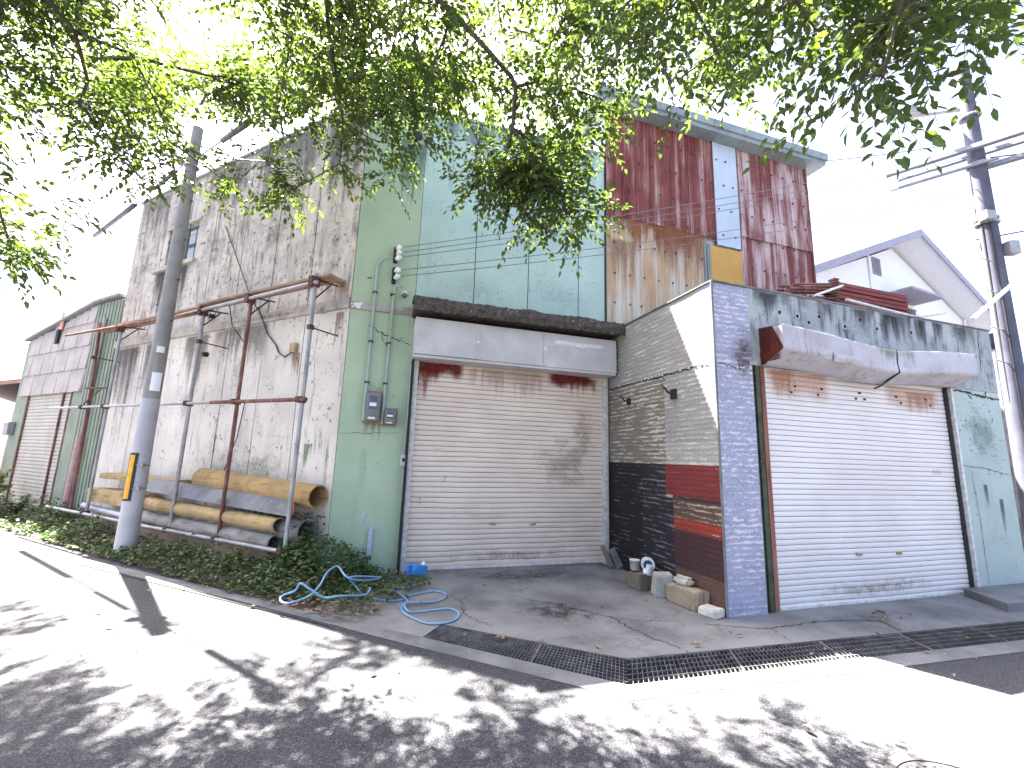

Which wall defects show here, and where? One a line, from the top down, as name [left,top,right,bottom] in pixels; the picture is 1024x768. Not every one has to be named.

rust [612,216,702,279]
leakage [882,314,942,342]
leakage [186,335,208,372]
leakage [113,346,151,404]
rust [418,362,462,393]
rust [551,374,594,390]
crack [524,598,681,650]